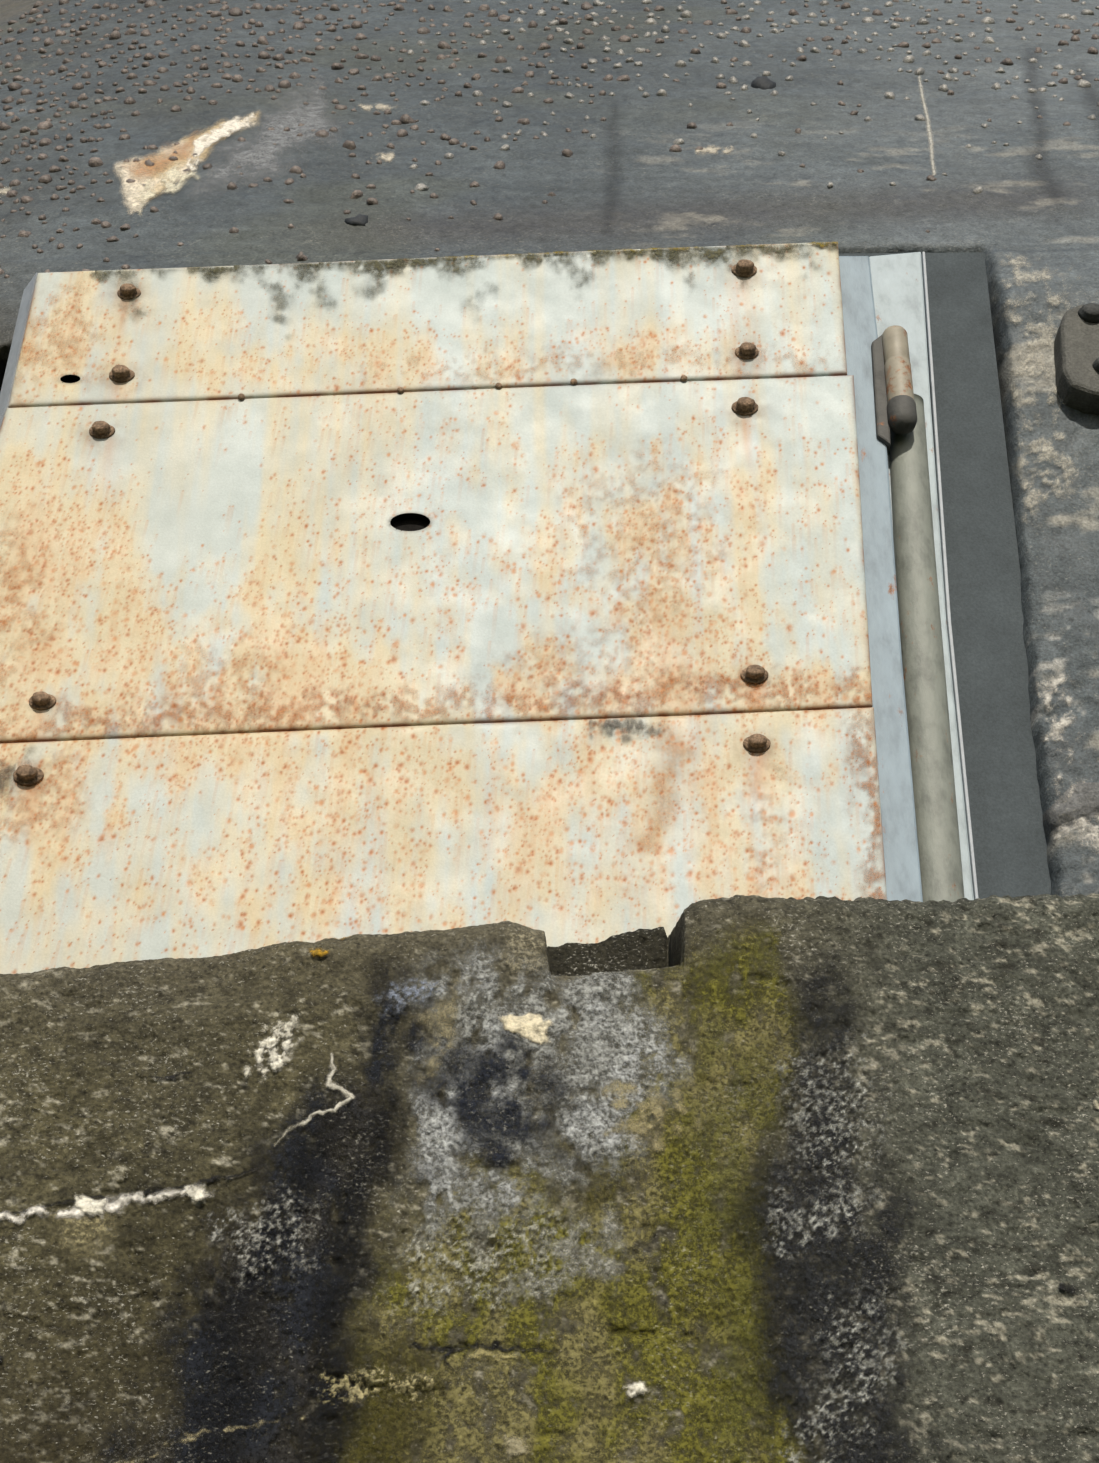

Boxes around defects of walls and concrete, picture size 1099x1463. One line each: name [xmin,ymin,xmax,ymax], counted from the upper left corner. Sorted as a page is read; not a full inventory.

spalling [115,113,258,212]
crack [0,1053,354,1251]
leakage [104,963,441,1463]
leakage [406,1212,577,1307]
leakage [706,968,915,1463]
leakage [626,1382,647,1397]
leakage [506,1438,526,1454]